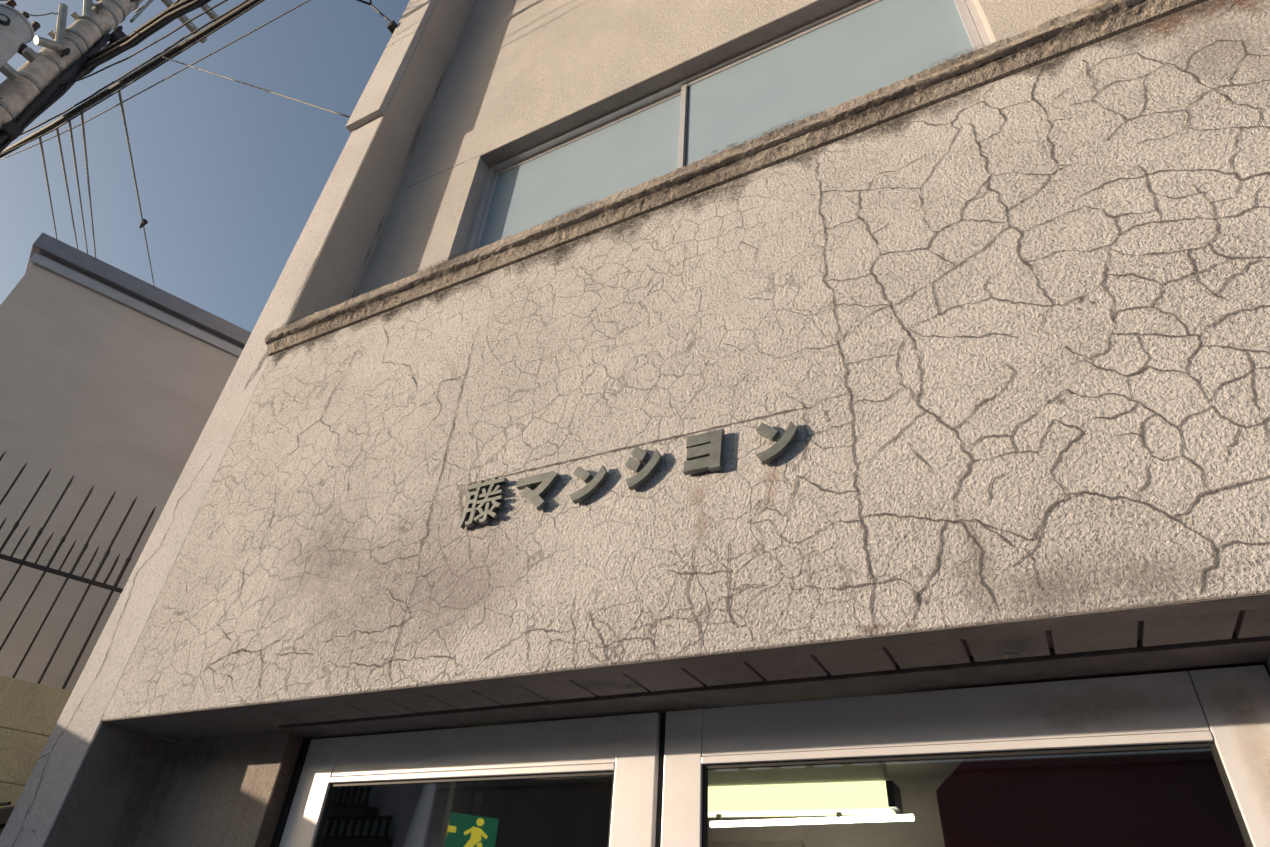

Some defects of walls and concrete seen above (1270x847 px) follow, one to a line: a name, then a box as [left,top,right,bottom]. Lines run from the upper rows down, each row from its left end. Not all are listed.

crack [12,452,212,847]
crack [205,1,1270,697]